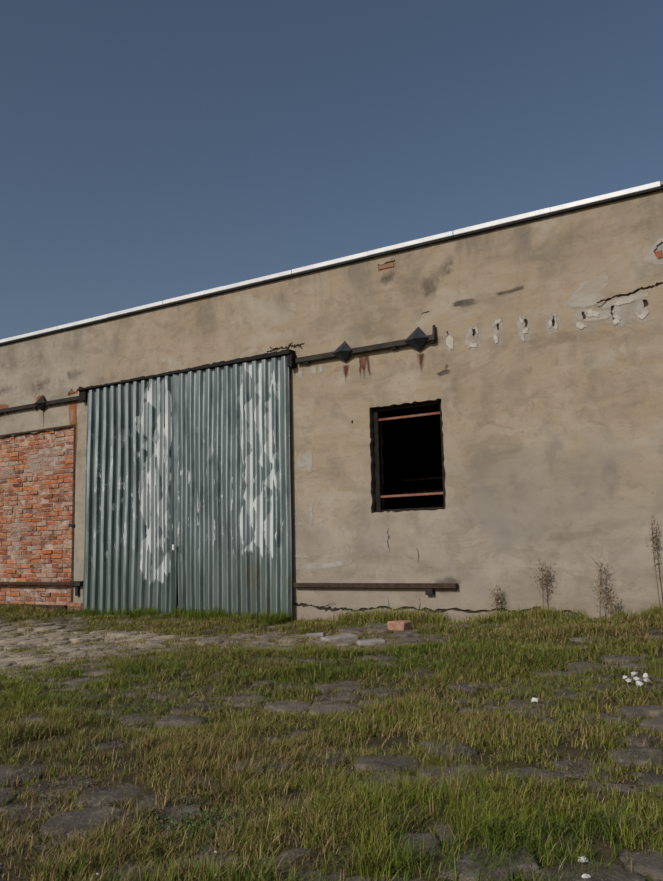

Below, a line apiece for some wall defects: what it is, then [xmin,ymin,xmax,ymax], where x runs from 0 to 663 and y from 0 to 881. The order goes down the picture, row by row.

peeling [643,238,663,264]
peeling [567,275,648,329]
crack [598,282,663,307]
crack [268,343,304,352]
crack [294,603,577,615]